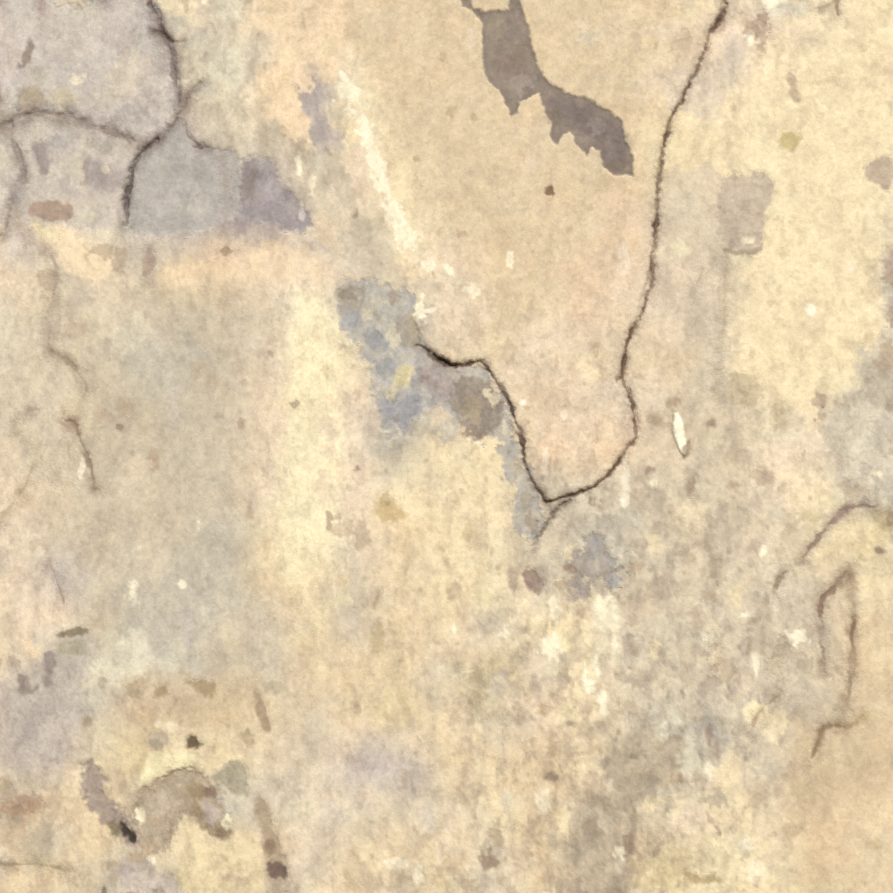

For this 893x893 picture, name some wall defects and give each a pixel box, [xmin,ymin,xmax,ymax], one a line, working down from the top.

crack [0,0,244,534]
crack [408,0,737,559]
crack [703,626,727,680]
crack [738,494,887,770]